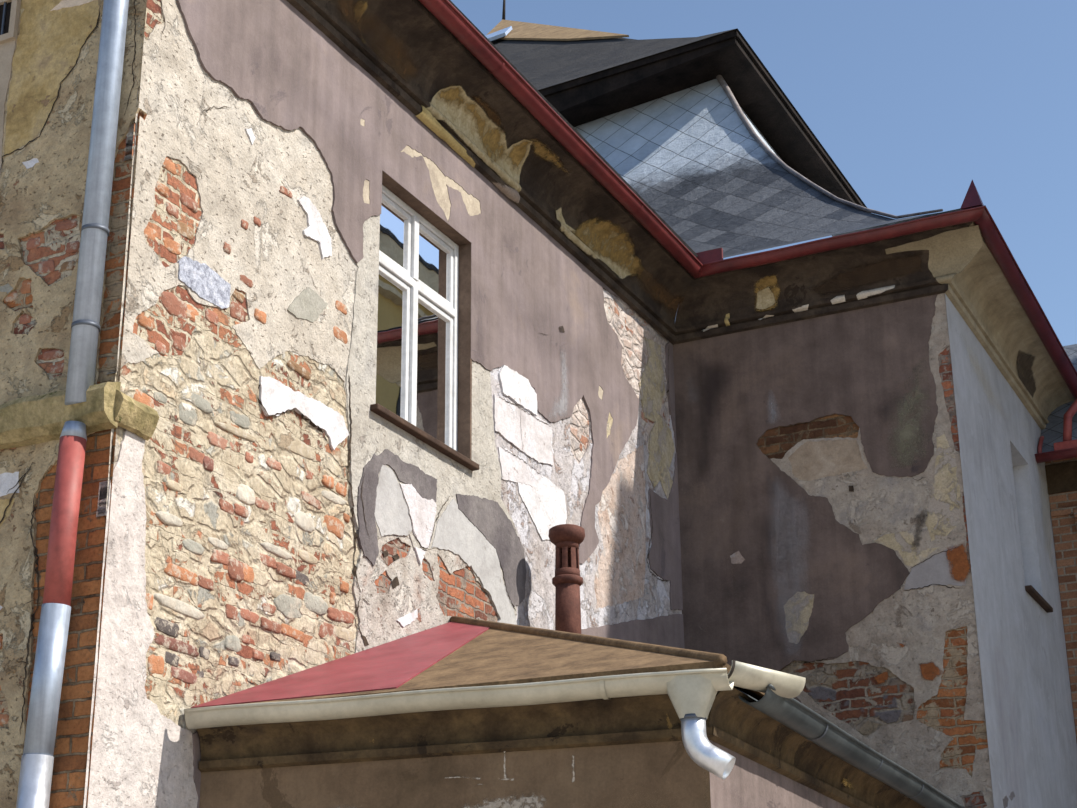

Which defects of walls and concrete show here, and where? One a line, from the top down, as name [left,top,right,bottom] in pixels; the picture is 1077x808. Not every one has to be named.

crack [1,8,100,167]
flaking render [4,0,99,157]
spalling [0,215,80,334]
spalling [36,349,64,379]
spalling [49,0,683,808]
peeling [702,313,730,332]
flaking render [0,472,19,527]
crack [0,462,39,734]
spalling [26,464,57,724]
crack [257,376,370,649]
spalling [755,225,994,808]
damp [464,795,544,808]